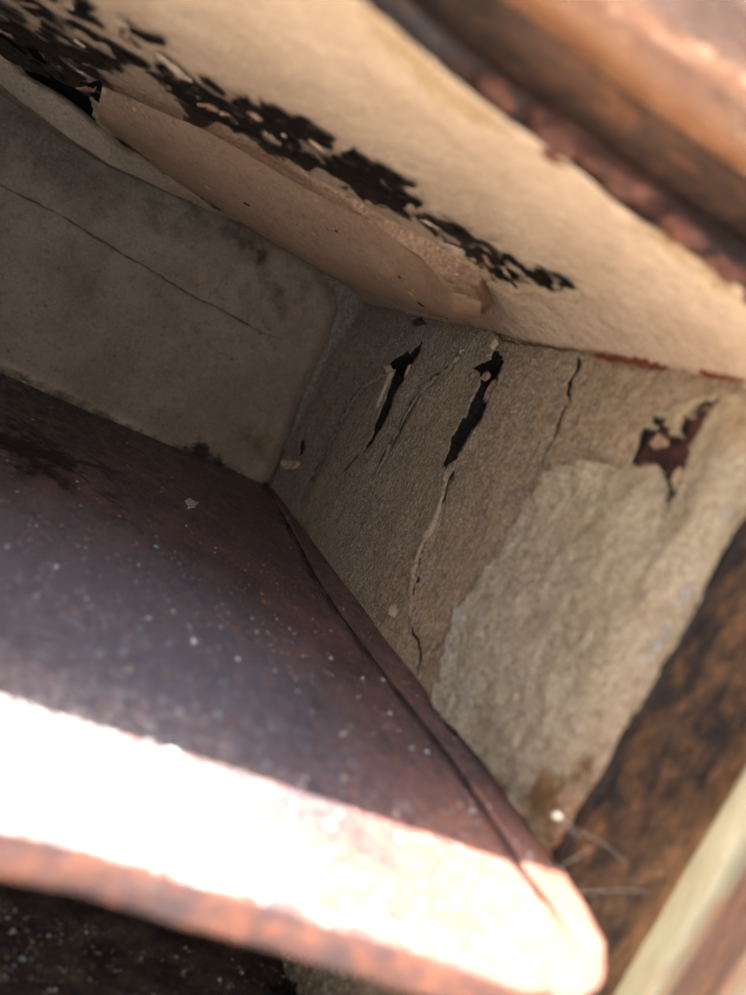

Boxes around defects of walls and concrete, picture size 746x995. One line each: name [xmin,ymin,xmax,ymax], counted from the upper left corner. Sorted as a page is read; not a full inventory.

crack [0,184,284,341]
spalling [0,0,585,304]
corrosion [477,70,517,113]
corrosion [527,106,746,305]
crack [344,318,426,471]
crack [408,331,583,670]
peeling [429,392,746,855]
corrosion [526,757,594,831]